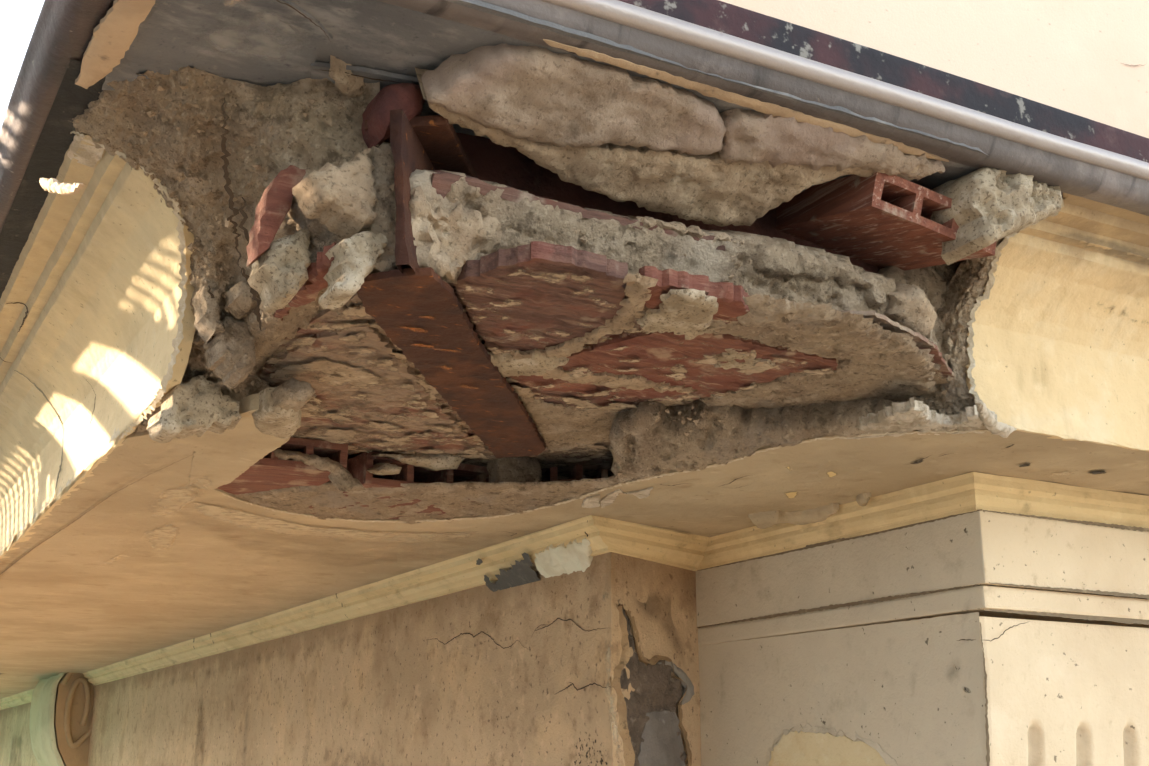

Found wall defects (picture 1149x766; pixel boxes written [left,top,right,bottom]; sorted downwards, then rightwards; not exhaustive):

spalling [67,43,1062,525]
spalling [1,454,97,551]
peeling [476,553,540,592]
crack [428,618,604,649]
crack [554,682,610,695]
flaking render [609,603,694,766]
peeling [765,723,898,766]